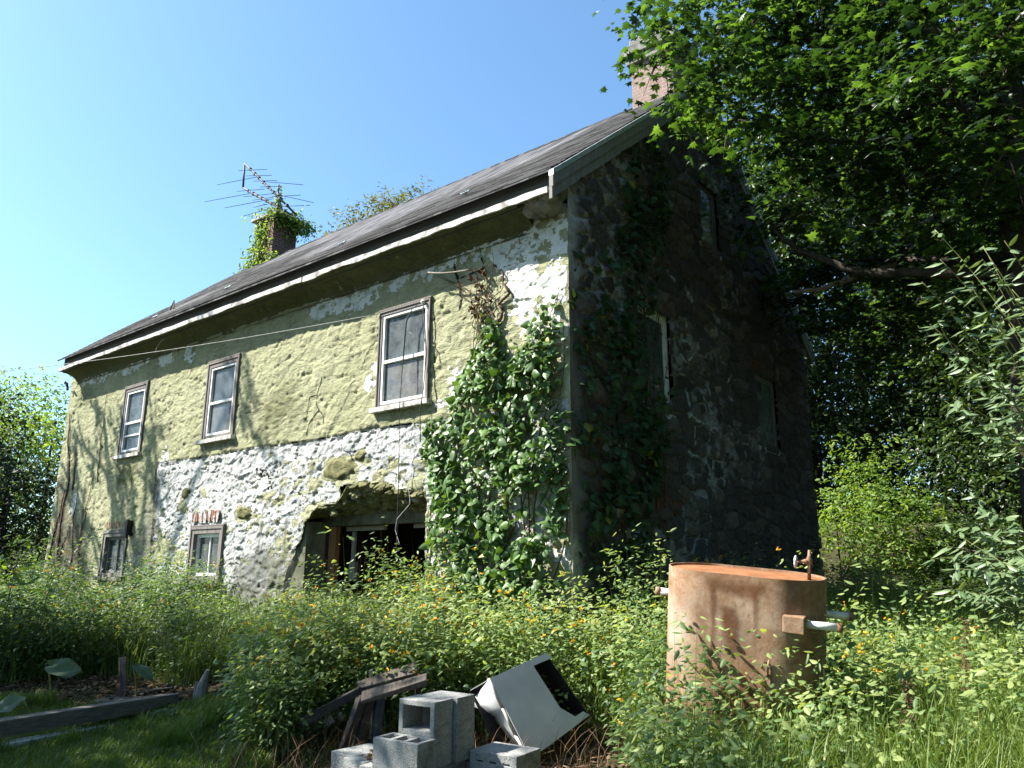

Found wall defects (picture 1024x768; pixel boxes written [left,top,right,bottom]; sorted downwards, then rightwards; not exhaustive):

peeling [307,182,578,351]
crack [150,306,440,554]
peeling [132,361,572,620]